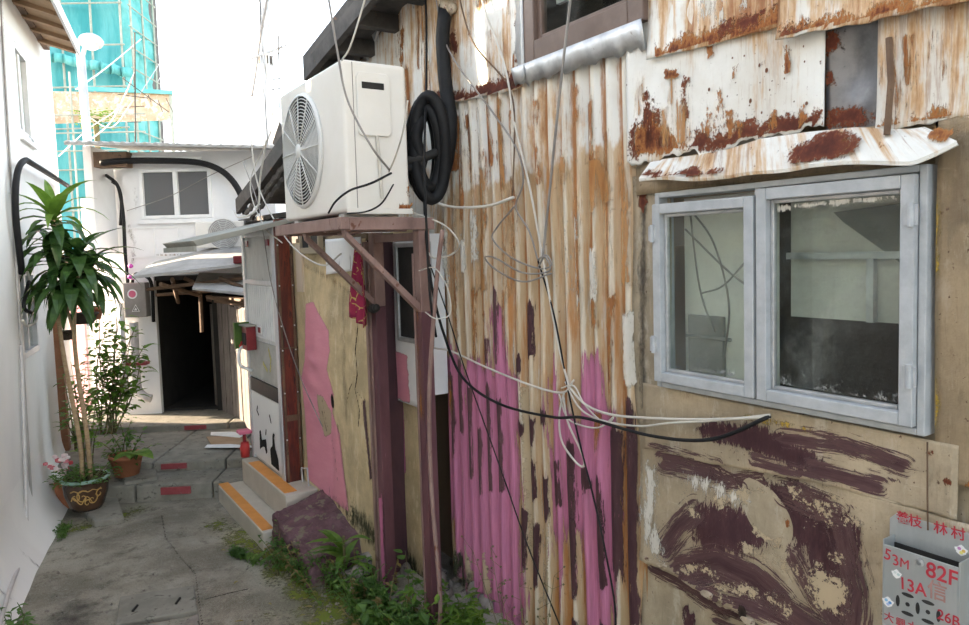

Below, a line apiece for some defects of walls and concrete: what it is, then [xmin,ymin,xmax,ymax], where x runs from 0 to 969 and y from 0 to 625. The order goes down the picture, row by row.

rust [573,0,969,452]